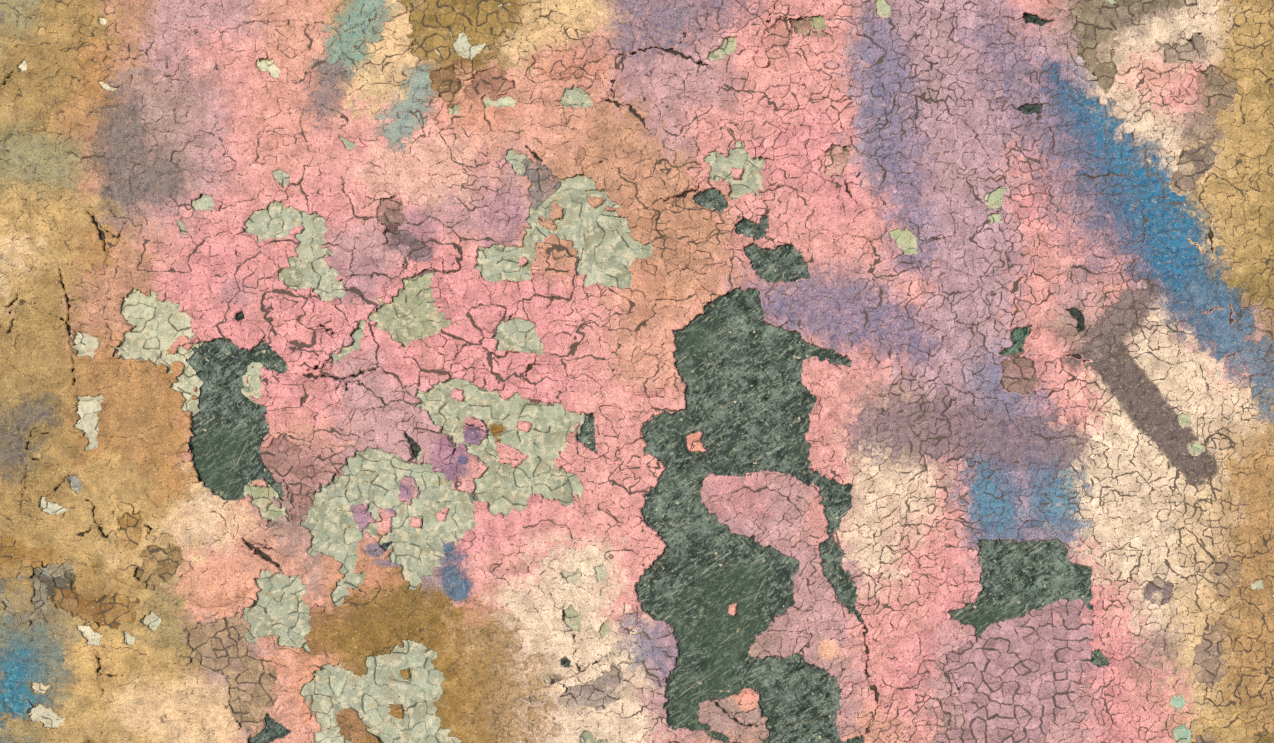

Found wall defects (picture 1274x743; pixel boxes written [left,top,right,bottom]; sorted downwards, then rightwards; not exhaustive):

crack [602,32,713,131]
crack [88,212,126,253]
peeling [230,170,357,305]
peeling [475,149,657,297]
crack [659,182,702,203]
crack [303,365,379,391]
spalling [628,141,864,743]
crack [243,496,282,568]
peeling [69,288,624,743]
crack [572,635,607,677]
crack [862,620,885,733]
peeling [935,538,1120,743]